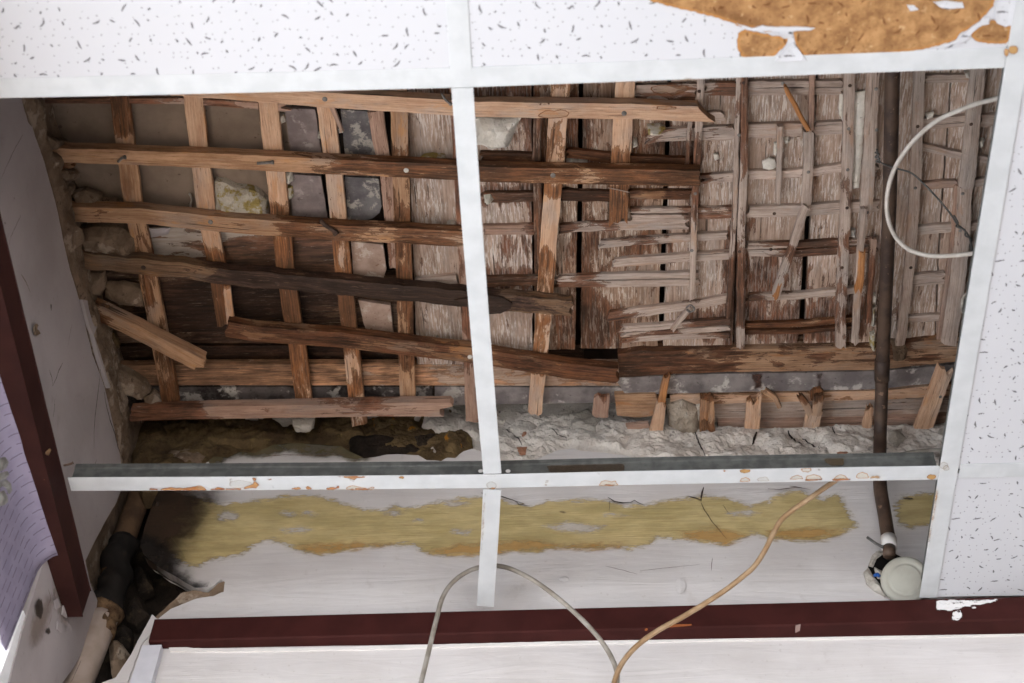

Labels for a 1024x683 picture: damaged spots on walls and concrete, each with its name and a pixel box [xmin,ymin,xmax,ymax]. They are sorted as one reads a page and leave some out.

spalling [22,97,481,464]
corrosion [149,478,271,491]
leakage [143,490,483,567]
corrosion [326,476,374,490]
crack [607,487,729,574]
leakage [498,491,858,553]
spalling [496,398,874,461]
corrosion [790,458,879,481]
leakage [893,493,934,528]
spalling [886,423,945,466]
spalling [109,566,225,683]
peeling [936,599,997,620]